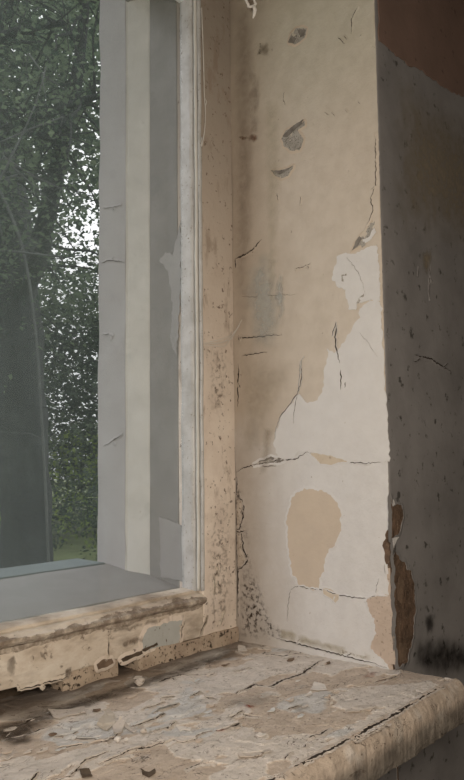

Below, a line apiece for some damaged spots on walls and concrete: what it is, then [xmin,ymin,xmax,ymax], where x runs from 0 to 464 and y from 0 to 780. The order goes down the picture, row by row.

flaking render [269,118,307,181]
peeling [252,220,391,468]
crack [332,322,346,389]
peeling [94,614,185,673]
peeling [159,516,182,582]
crack [176,357,314,644]
crack [149,564,388,695]
peeling [284,486,344,605]
crack [348,459,383,467]
flaking render [345,491,418,690]
spalling [0,684,51,699]
peeling [23,690,247,780]